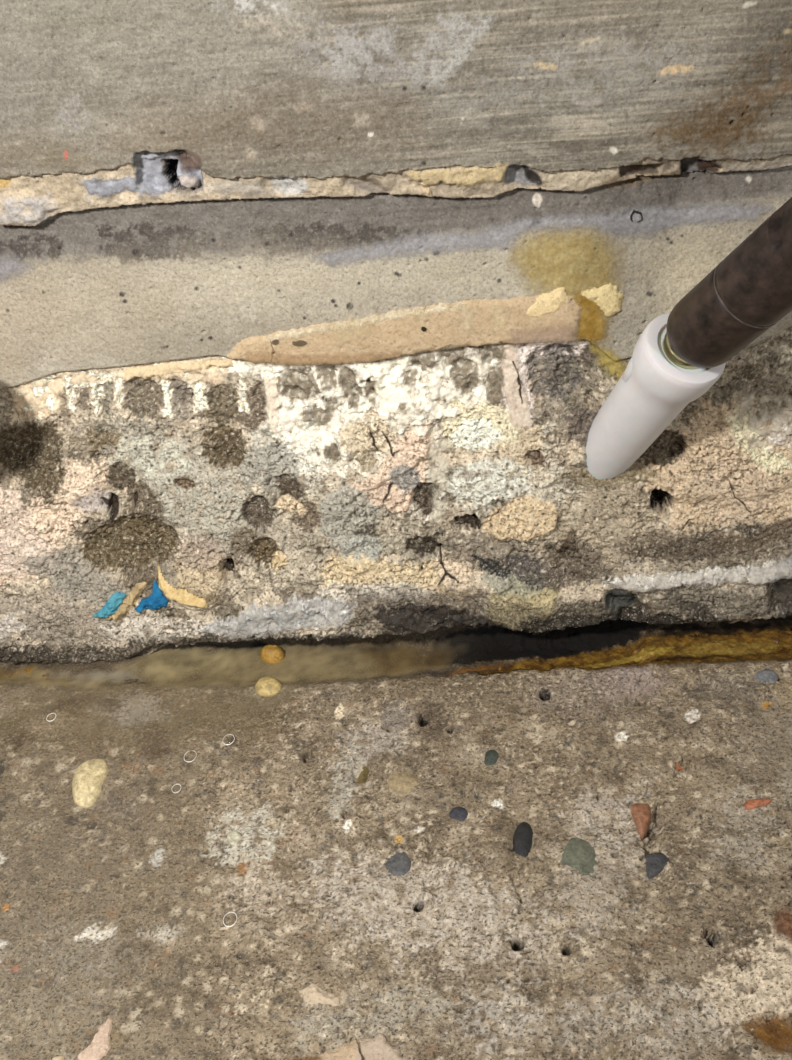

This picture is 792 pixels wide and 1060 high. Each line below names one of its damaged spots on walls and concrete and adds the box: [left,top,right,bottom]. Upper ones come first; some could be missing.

spalling [84,149,203,196]
spalling [0,283,792,664]
rust [440,626,792,677]
rust [774,912,792,940]
peeling [293,1033,411,1060]
rust [742,1015,792,1054]